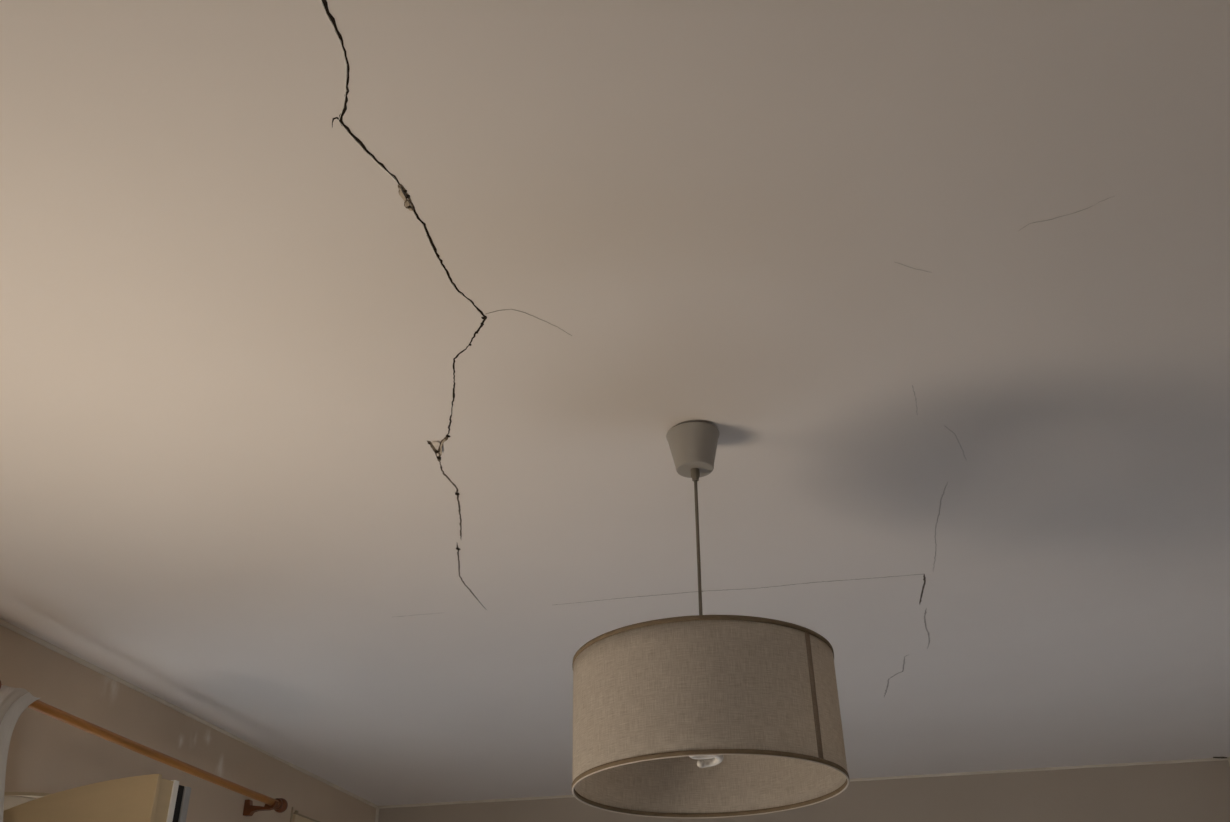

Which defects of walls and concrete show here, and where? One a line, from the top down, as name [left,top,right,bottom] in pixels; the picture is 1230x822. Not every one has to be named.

crack [320,0,572,609]
crack [555,426,967,697]